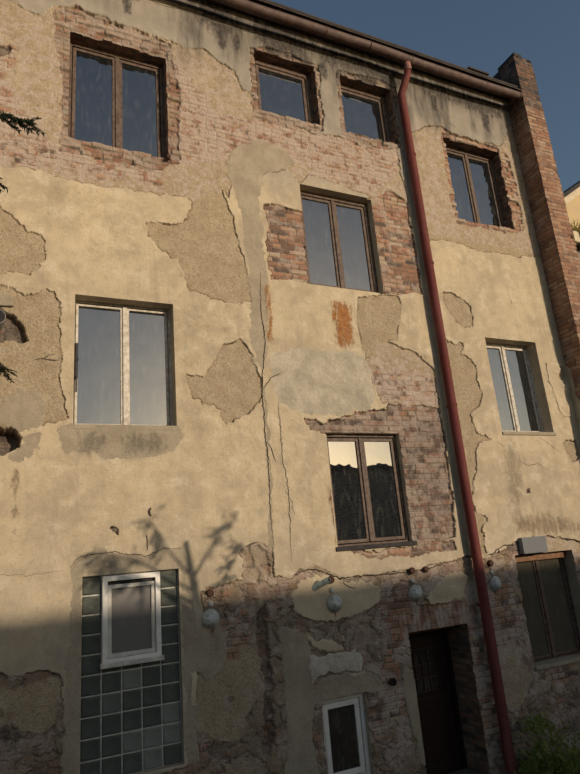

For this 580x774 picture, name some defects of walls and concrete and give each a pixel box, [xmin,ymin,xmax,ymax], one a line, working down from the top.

leakage [254,19,399,85]
leakage [422,82,503,132]
spalling [411,124,541,261]
spalling [0,0,459,559]
corrosion [332,302,353,347]
crack [260,273,464,588]
spalling [440,288,474,328]
spalling [446,336,492,493]
peeling [546,361,573,418]
spalling [0,664,66,774]
spalling [160,542,508,774]
spalling [473,503,580,774]